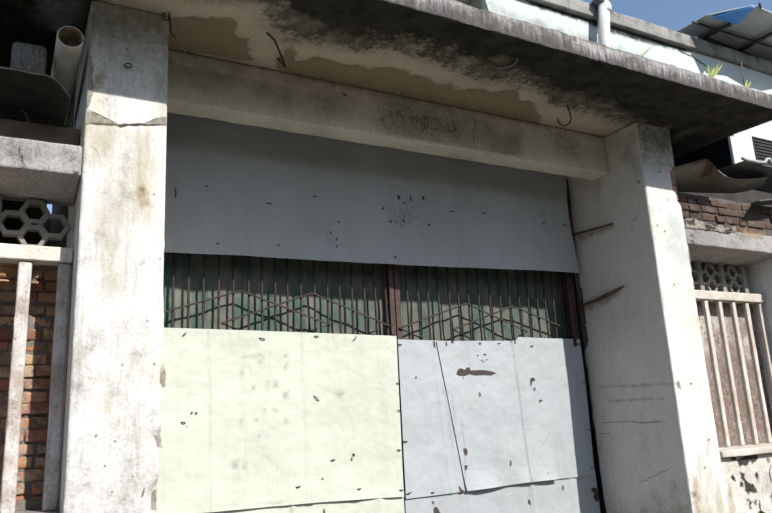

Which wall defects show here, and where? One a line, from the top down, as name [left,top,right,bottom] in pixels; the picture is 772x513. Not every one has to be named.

damp [0,0,98,76]
damp [168,17,253,60]
damp [258,0,772,159]
crack [91,111,160,127]
spalling [685,218,736,233]
corrosion [578,286,624,308]
peeling [744,494,772,513]